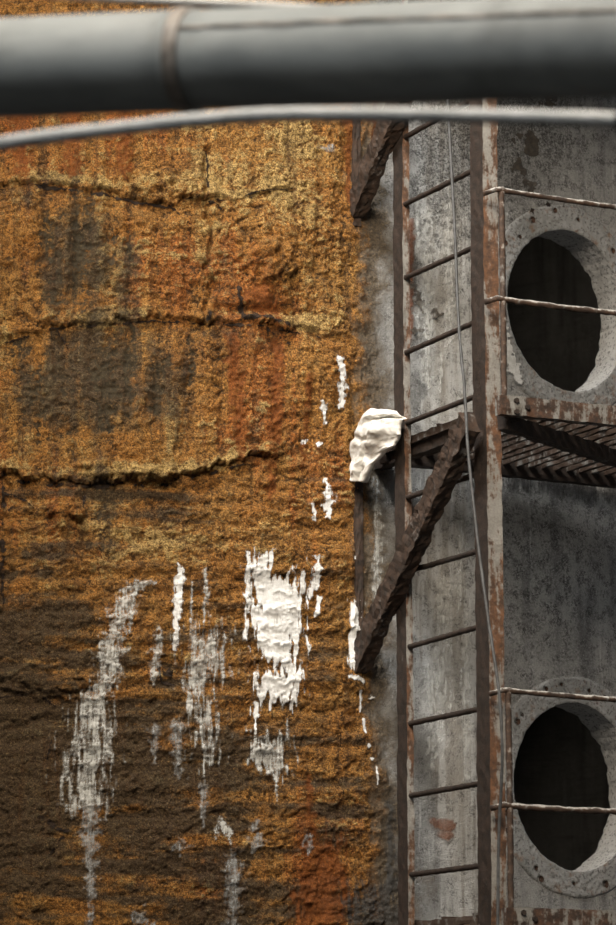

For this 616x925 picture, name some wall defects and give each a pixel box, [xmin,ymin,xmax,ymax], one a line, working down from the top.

crack [27,153,293,225]
crack [5,310,320,367]
crack [0,463,246,604]
damp [60,580,156,896]
damp [150,562,210,678]
damp [183,634,232,774]
damp [243,549,323,787]
corrosion [431,818,456,839]